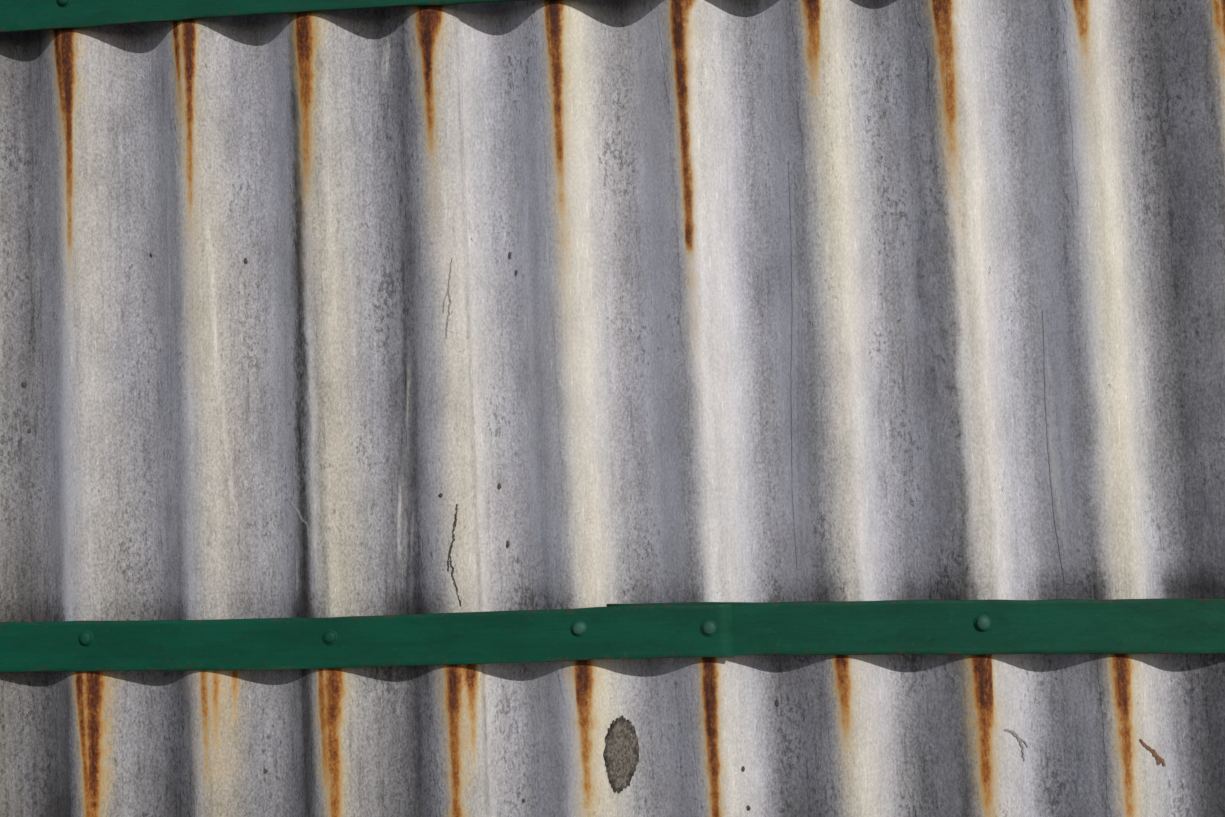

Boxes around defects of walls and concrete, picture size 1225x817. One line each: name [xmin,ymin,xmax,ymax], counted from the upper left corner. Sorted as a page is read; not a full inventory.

rust [41,27,102,366]
rust [163,18,216,443]
rust [284,11,336,339]
rust [529,0,588,483]
rust [655,0,717,492]
rust [915,0,977,336]
rust [65,671,131,817]
rust [308,668,359,817]
rust [557,659,612,817]
spalling [603,715,639,794]
rust [687,657,733,817]
rust [951,654,1009,817]